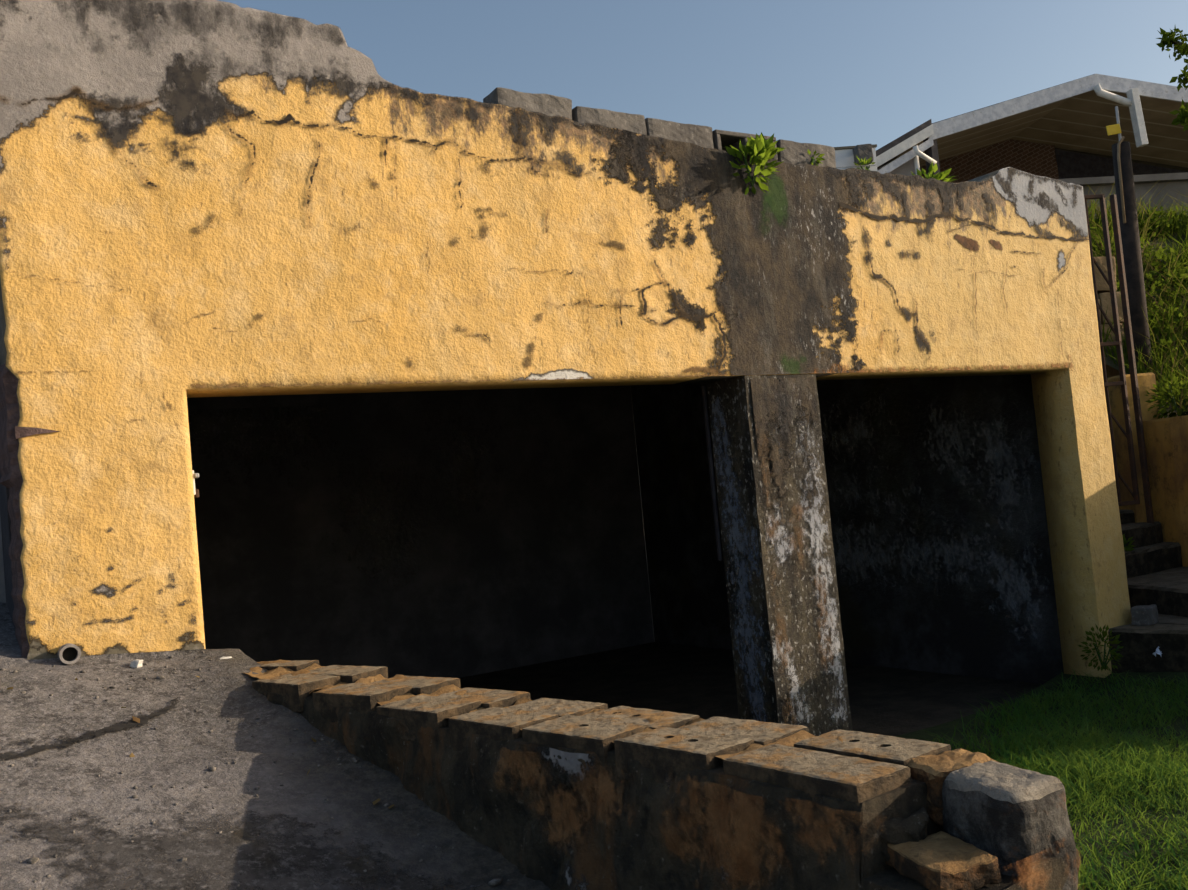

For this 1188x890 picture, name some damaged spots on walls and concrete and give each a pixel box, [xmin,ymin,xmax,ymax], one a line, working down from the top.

water stain [74,0,231,47]
water stain [250,14,300,43]
water stain [82,51,254,169]
peeling [0,0,393,174]
crack [227,107,590,219]
peeling [991,167,1089,238]
crack [510,260,727,372]
water stain [290,71,1084,541]
crack [839,202,1090,360]
spalling [513,368,593,381]
peeling [91,566,144,598]
crack [0,697,179,759]